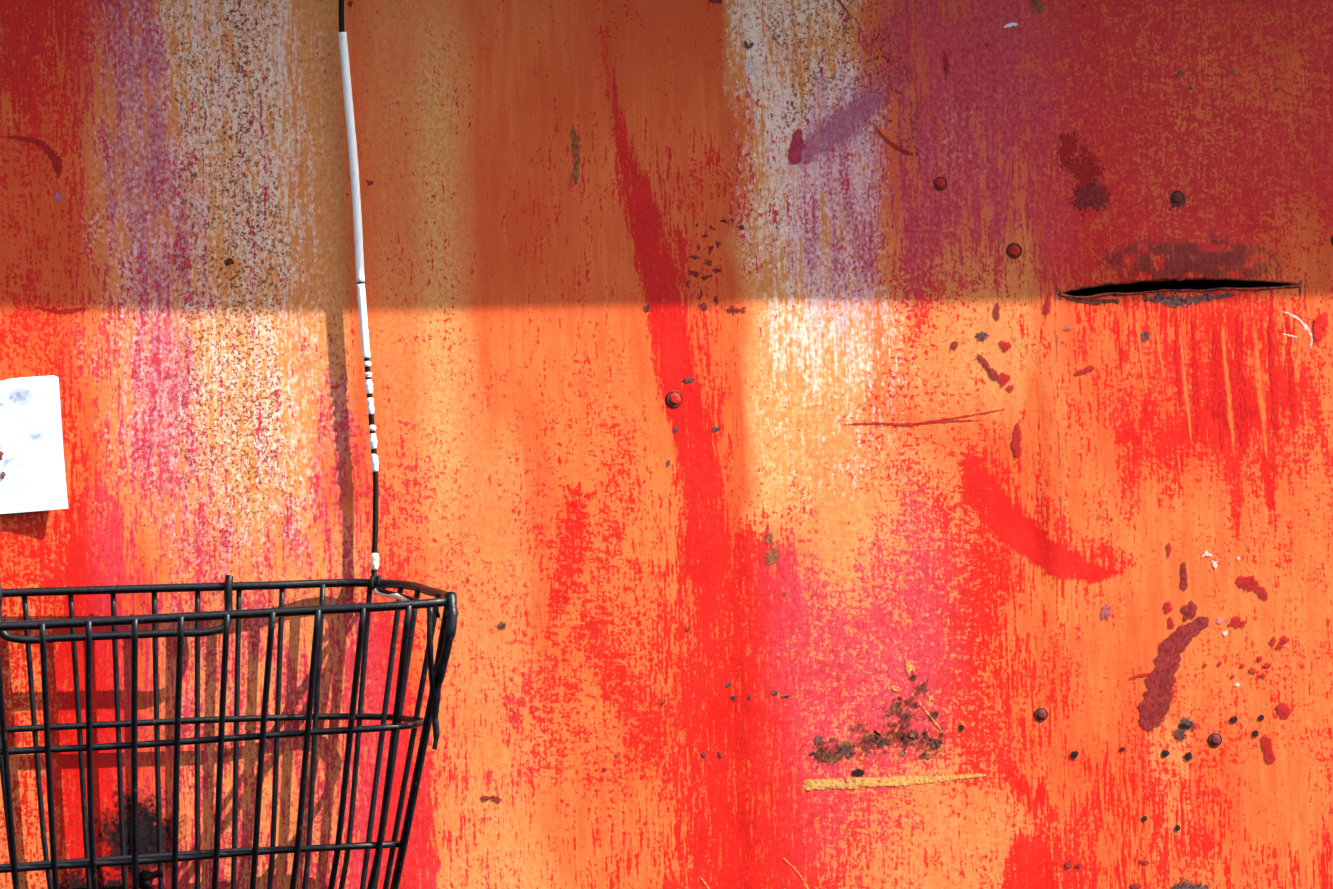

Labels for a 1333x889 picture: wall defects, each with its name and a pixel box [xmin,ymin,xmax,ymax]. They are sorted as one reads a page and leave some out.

corrosion [810,663,945,768]
corrosion [1168,871,1212,889]